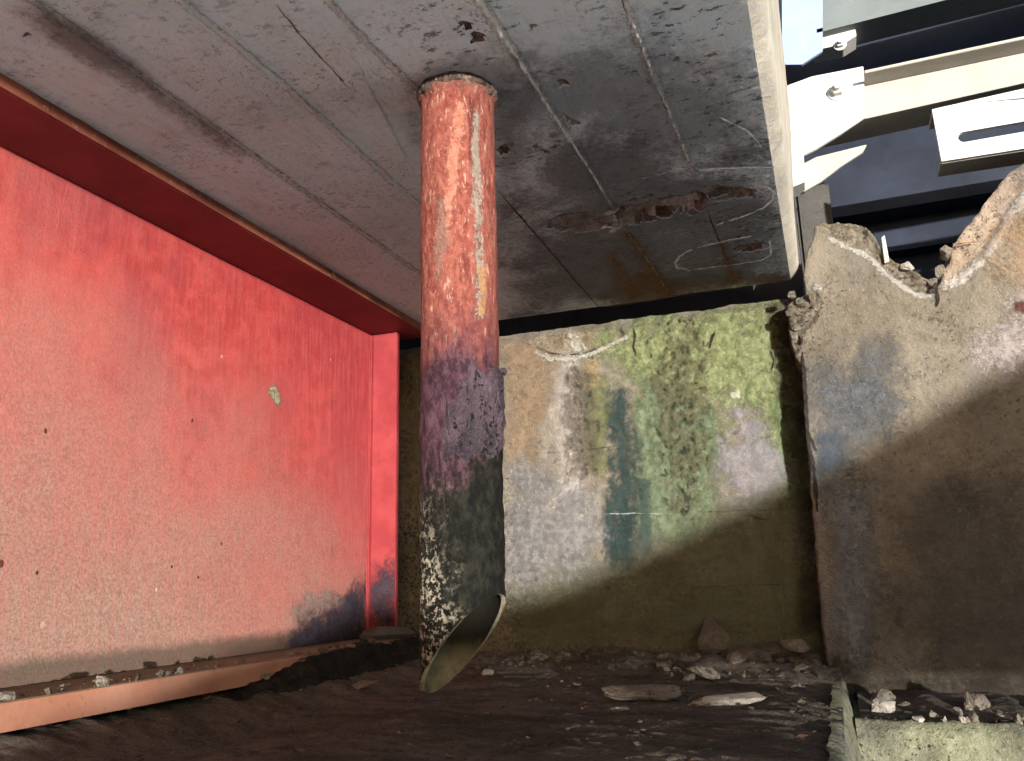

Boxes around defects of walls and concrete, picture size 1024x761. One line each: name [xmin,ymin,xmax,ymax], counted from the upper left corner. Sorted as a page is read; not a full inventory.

crack [278,7,345,84]
water stain [27,0,421,273]
peeling [444,101,487,319]
spalling [611,186,757,225]
spalling [822,171,1024,296]
peeling [268,386,281,405]
water stain [502,331,1024,697]